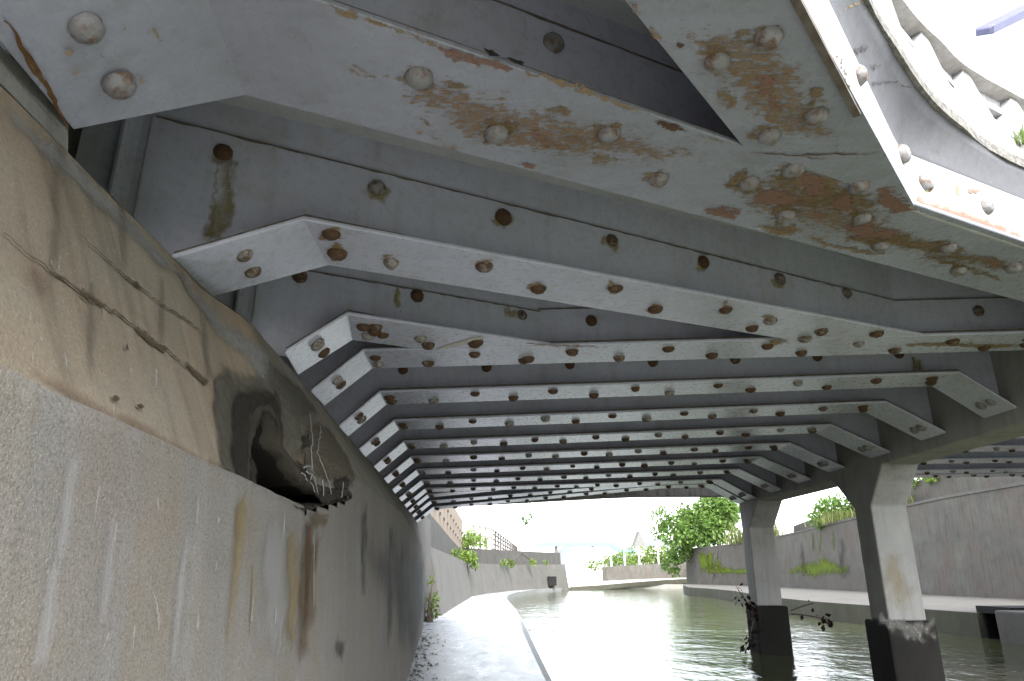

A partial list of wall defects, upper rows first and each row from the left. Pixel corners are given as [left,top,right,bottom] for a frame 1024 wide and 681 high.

corrosion [332,6,512,72]
corrosion [349,64,693,181]
corrosion [676,25,839,148]
corrosion [725,163,1021,280]
crack [4,233,211,386]
spalling [247,403,355,511]
water stain [362,513,424,664]